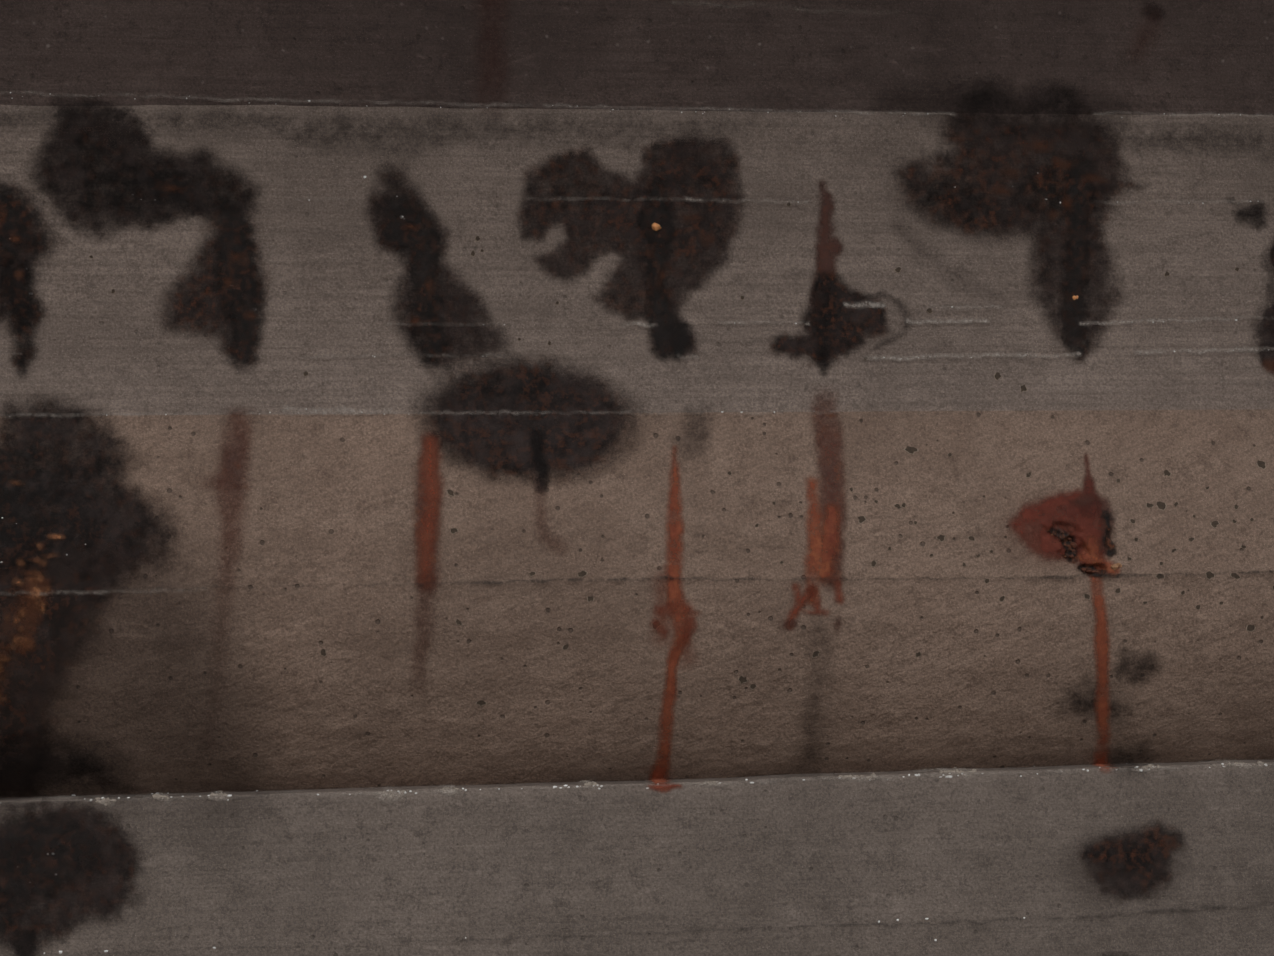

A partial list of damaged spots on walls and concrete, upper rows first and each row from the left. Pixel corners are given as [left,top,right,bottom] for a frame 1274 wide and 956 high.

leakage [0,185,51,373]
leakage [33,101,265,364]
leakage [370,167,634,493]
leakage [521,138,742,359]
leakage [898,88,1134,360]
leakage [1232,286,1274,371]
leakage [0,401,175,956]
corrosion [415,436,440,601]
corrosion [649,449,695,790]
corrosion [784,396,845,629]
corrosion [1012,455,1119,771]
leakage [1083,824,1182,897]